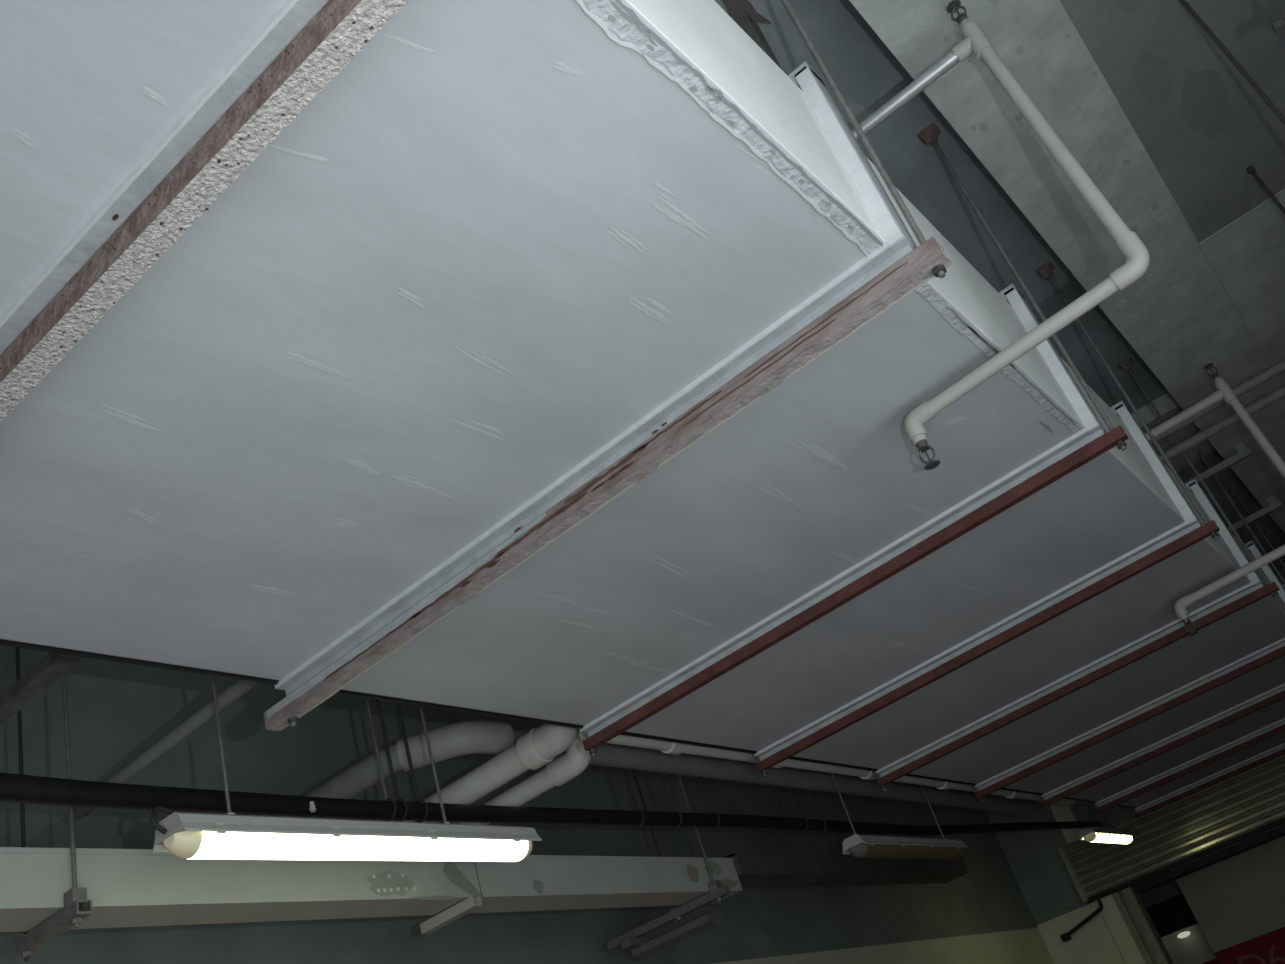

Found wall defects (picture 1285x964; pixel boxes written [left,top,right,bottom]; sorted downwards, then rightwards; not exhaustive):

peeling [576,0,870,257]
rust [323,262,908,681]